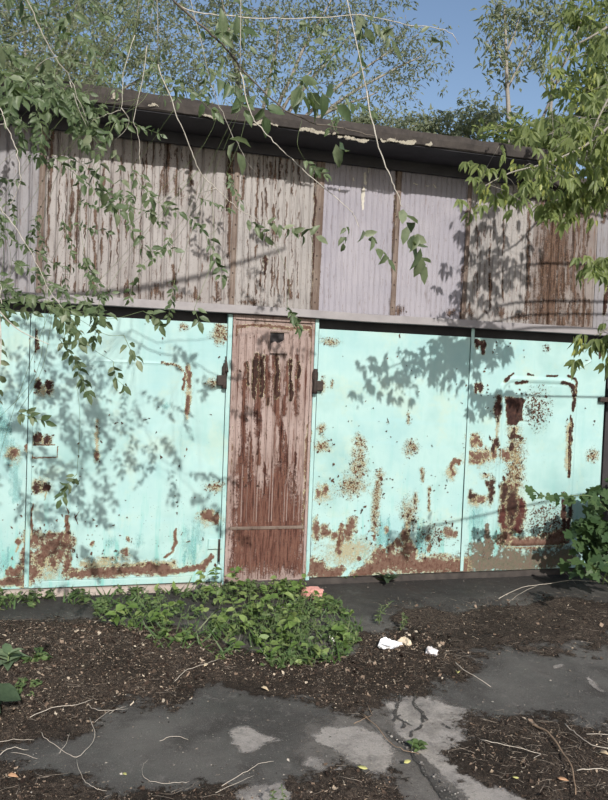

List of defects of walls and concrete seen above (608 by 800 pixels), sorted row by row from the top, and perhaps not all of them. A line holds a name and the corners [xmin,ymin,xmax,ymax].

rust [35,130,194,297]
rust [150,151,301,306]
rust [310,161,323,309]
rust [446,202,591,327]
rust [5,432,58,467]
rust [29,328,54,395]
rust [94,420,103,462]
rust [161,361,192,419]
rust [198,323,581,579]
rust [0,478,216,588]